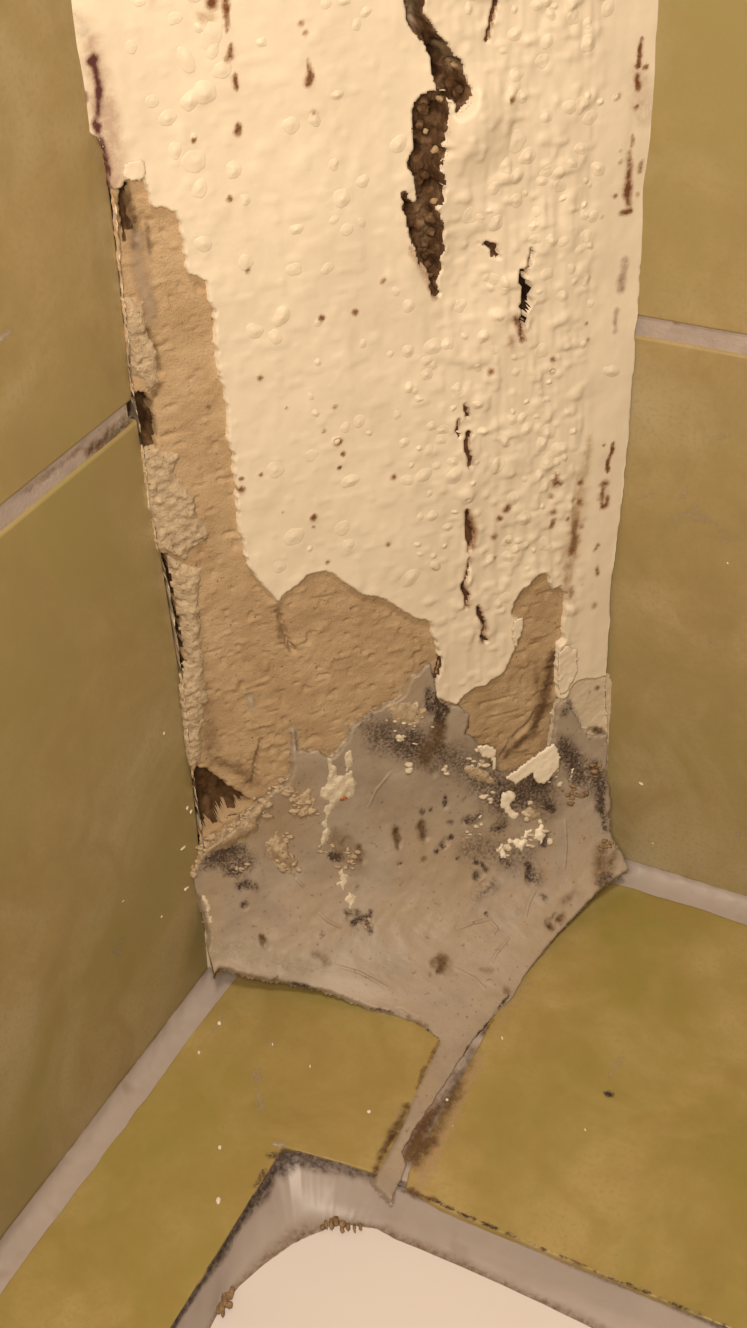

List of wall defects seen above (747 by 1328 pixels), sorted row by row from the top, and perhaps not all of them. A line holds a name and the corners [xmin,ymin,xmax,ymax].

crack [400,0,498,296]
crack [482,241,533,342]
peeling [110,159,439,844]
crack [455,405,472,467]
rust [601,442,614,508]
crack [461,509,488,643]
peeling [436,573,612,784]
leakage [202,845,258,907]
leakage [320,689,556,933]
peeling [499,807,545,858]
leakage [558,737,607,831]